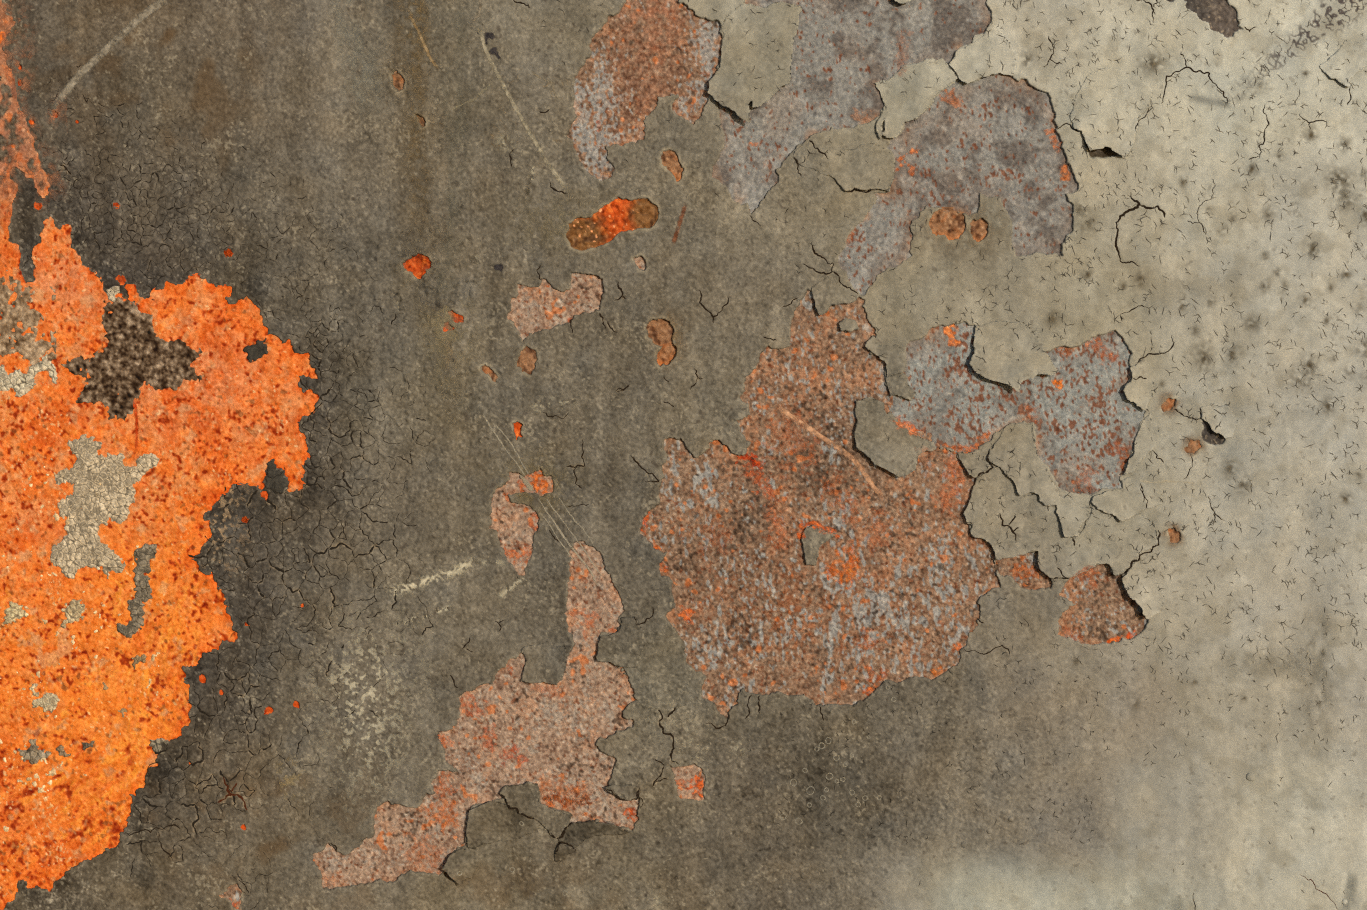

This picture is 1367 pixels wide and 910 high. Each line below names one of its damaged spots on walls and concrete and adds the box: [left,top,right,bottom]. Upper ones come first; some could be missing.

peeling [1167,0,1241,38]
peeling [1320,40,1367,87]
peeling [507,273,604,374]
peeling [567,0,1181,718]
corrosion [0,0,319,910]
crack [8,65,435,909]
peeling [489,469,554,575]
crack [450,620,504,688]
peeling [313,541,646,889]